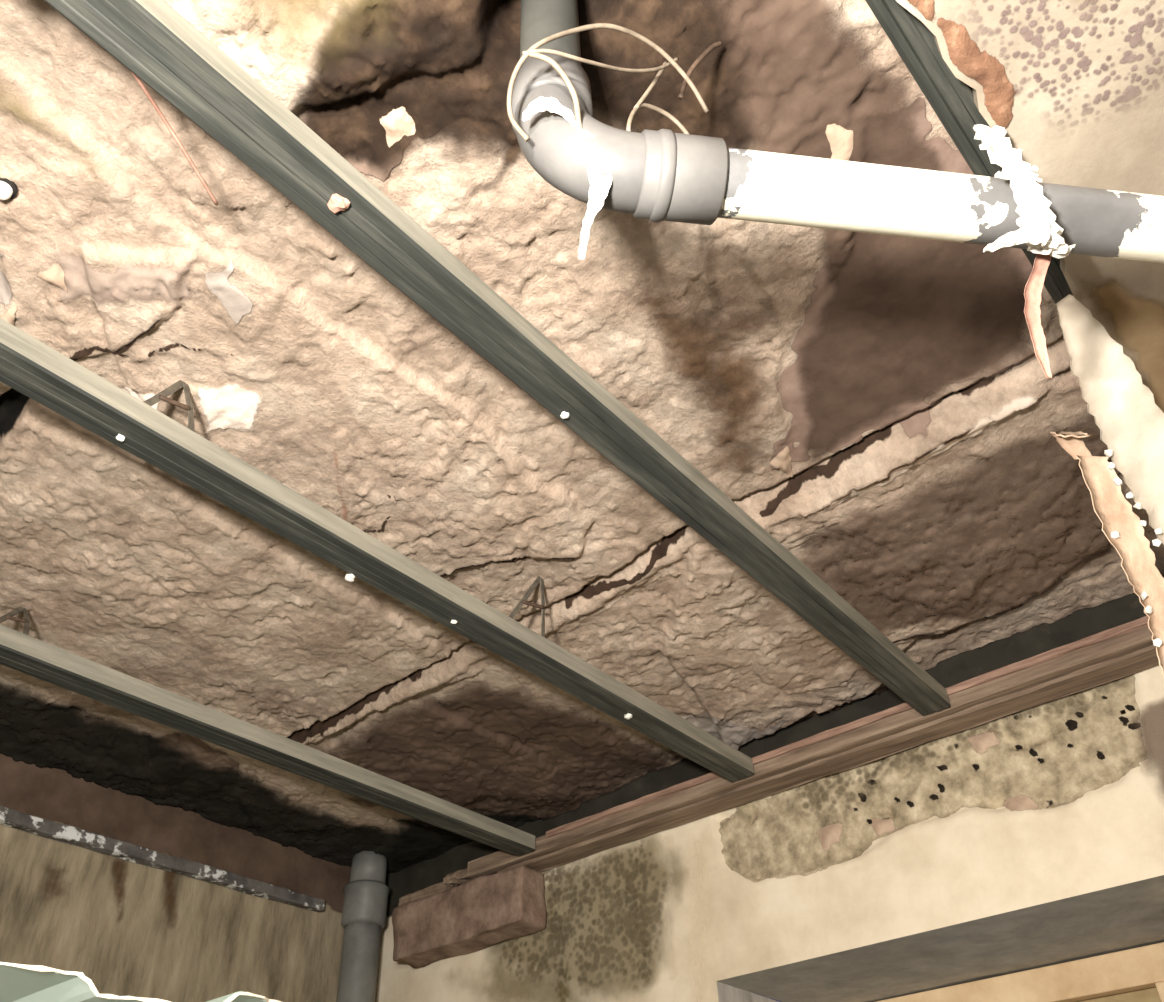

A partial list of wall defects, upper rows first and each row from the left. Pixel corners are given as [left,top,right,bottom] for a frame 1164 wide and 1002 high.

water stain [985,0,1164,108]
crack [0,388,29,437]
crack [928,363,1016,409]
crack [759,421,898,517]
crack [565,525,687,609]
peeling [1050,431,1164,676]
water stain [925,593,1147,688]
water stain [0,684,500,917]
water stain [329,686,712,838]
water stain [738,689,905,758]
spalling [719,674,1147,882]
water stain [498,849,664,1002]